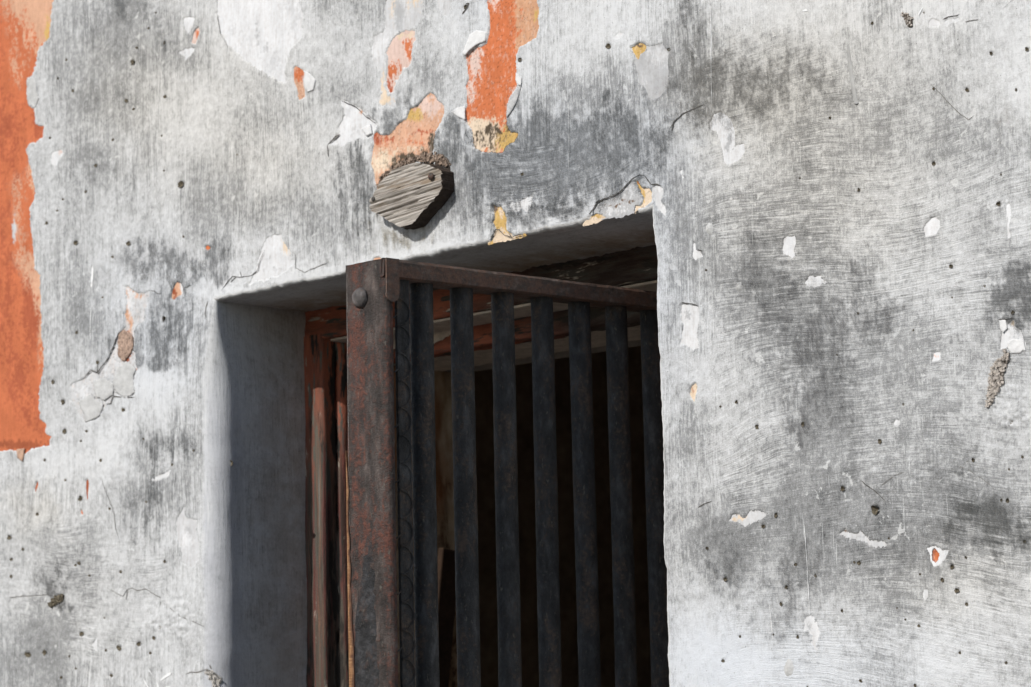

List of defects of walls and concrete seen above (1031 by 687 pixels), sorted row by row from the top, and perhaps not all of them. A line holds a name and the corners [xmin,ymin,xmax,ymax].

peeling [216,0,316,100]
peeling [331,0,539,189]
peeling [710,112,745,164]
peeling [0,0,66,461]
peeling [488,195,533,245]
peeling [583,213,606,226]
crack [83,327,125,379]
flaking render [985,310,1026,407]
peeling [729,510,777,528]
peeling [840,529,890,548]
peeling [927,546,954,582]
corrosion [355,532,380,687]